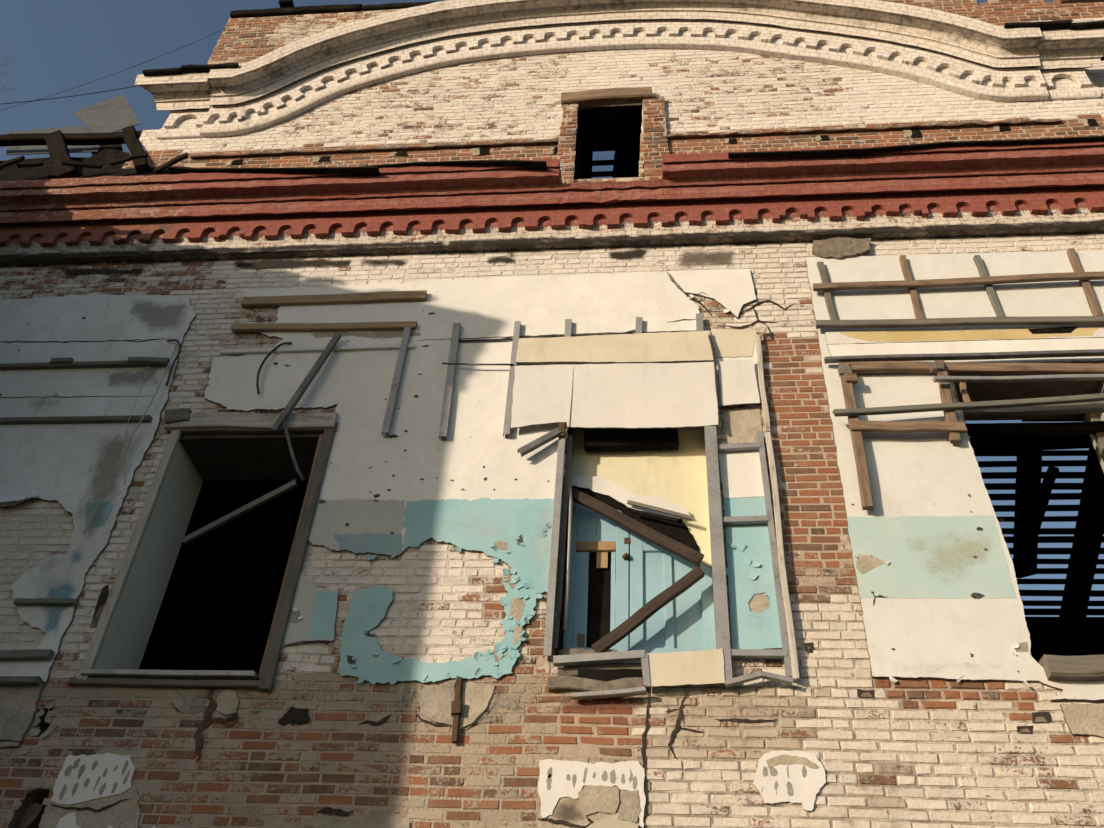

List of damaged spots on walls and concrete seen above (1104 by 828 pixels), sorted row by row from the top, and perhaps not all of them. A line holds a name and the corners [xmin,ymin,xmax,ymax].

crack [416,273,796,341]
flaking render [688,294,733,329]
flaking render [0,503,74,650]
spalling [90,585,109,628]
flaking render [301,534,556,681]
flaking render [279,638,376,685]
spalling [31,701,57,740]
flaking render [9,753,136,828]
crack [171,688,237,761]
crack [637,690,777,828]